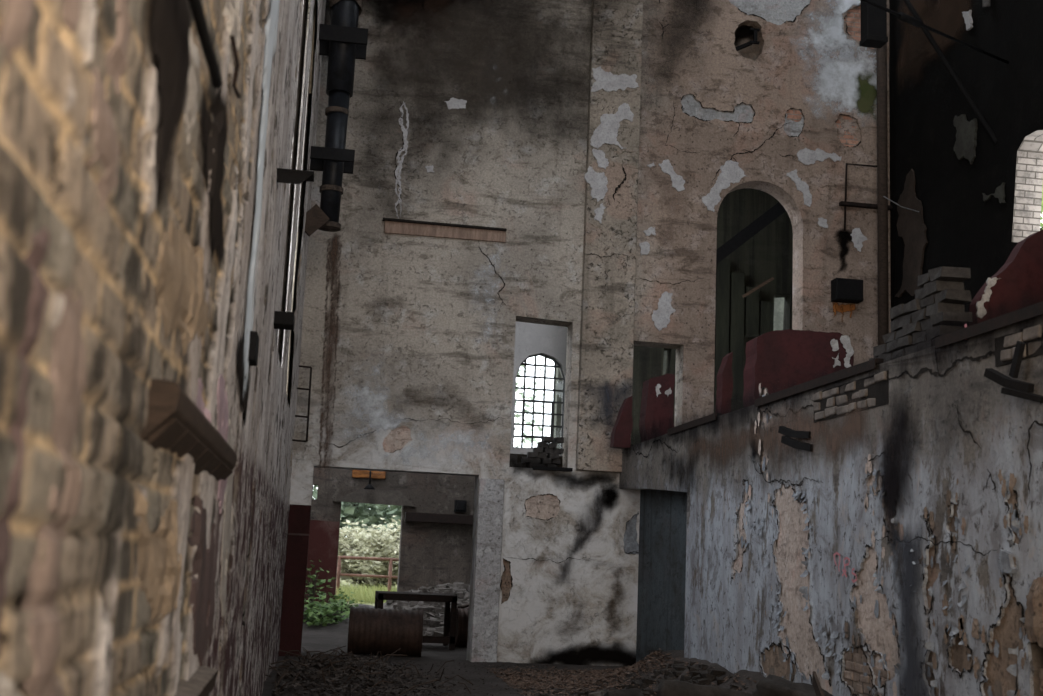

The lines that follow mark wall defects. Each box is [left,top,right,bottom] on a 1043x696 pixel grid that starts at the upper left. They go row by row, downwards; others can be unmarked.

flaking render [729,0,811,25]
flaking render [681,94,755,123]
crack [394,101,409,219]
crack [478,240,506,311]
crack [887,350,995,380]
crack [955,406,996,490]
crack [1027,420,1043,506]
flaking render [524,494,560,521]
peeling [731,383,904,696]
flaking render [500,558,513,604]
leakage [607,568,623,630]
peeling [909,469,1029,696]